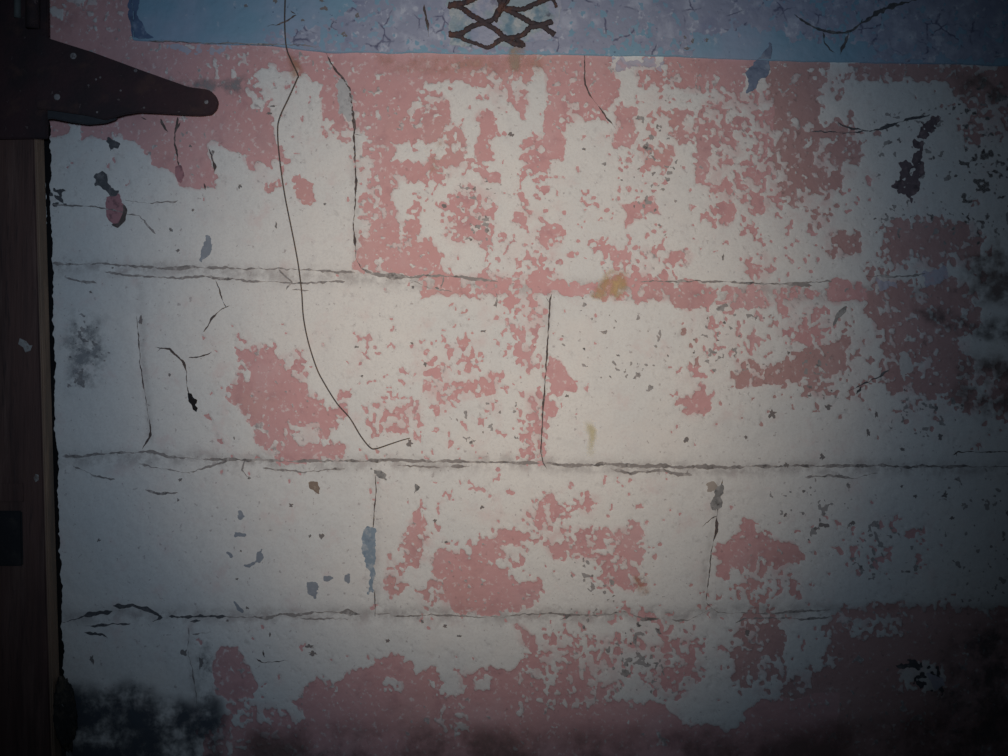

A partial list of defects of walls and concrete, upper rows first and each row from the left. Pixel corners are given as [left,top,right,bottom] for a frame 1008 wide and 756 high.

crack [52,11,498,331]
peeling [46,0,1008,501]
crack [642,279,832,287]
crack [794,0,916,54]
crack [63,294,1008,703]
peeling [199,467,929,756]
spalling [896,659,944,696]